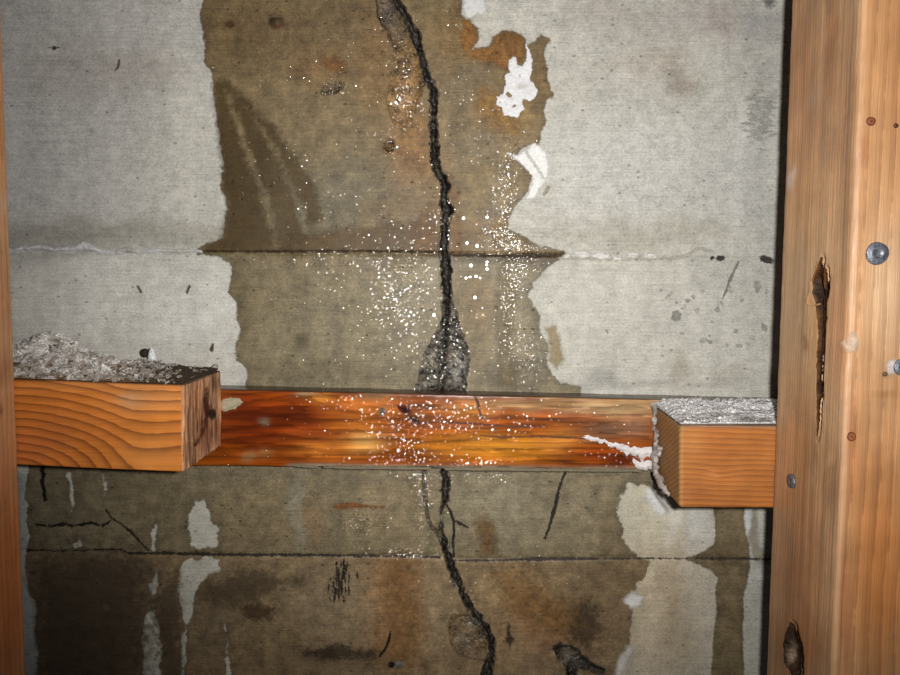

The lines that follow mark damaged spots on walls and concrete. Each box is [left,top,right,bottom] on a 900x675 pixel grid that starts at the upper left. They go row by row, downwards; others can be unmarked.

rust [462,21,525,68]
rust [479,88,519,134]
leakage [9,0,713,393]
crack [390,0,455,390]
crack [39,466,47,501]
crack [35,509,149,551]
leakage [18,397,778,675]
crack [544,471,566,539]
crack [422,468,496,675]